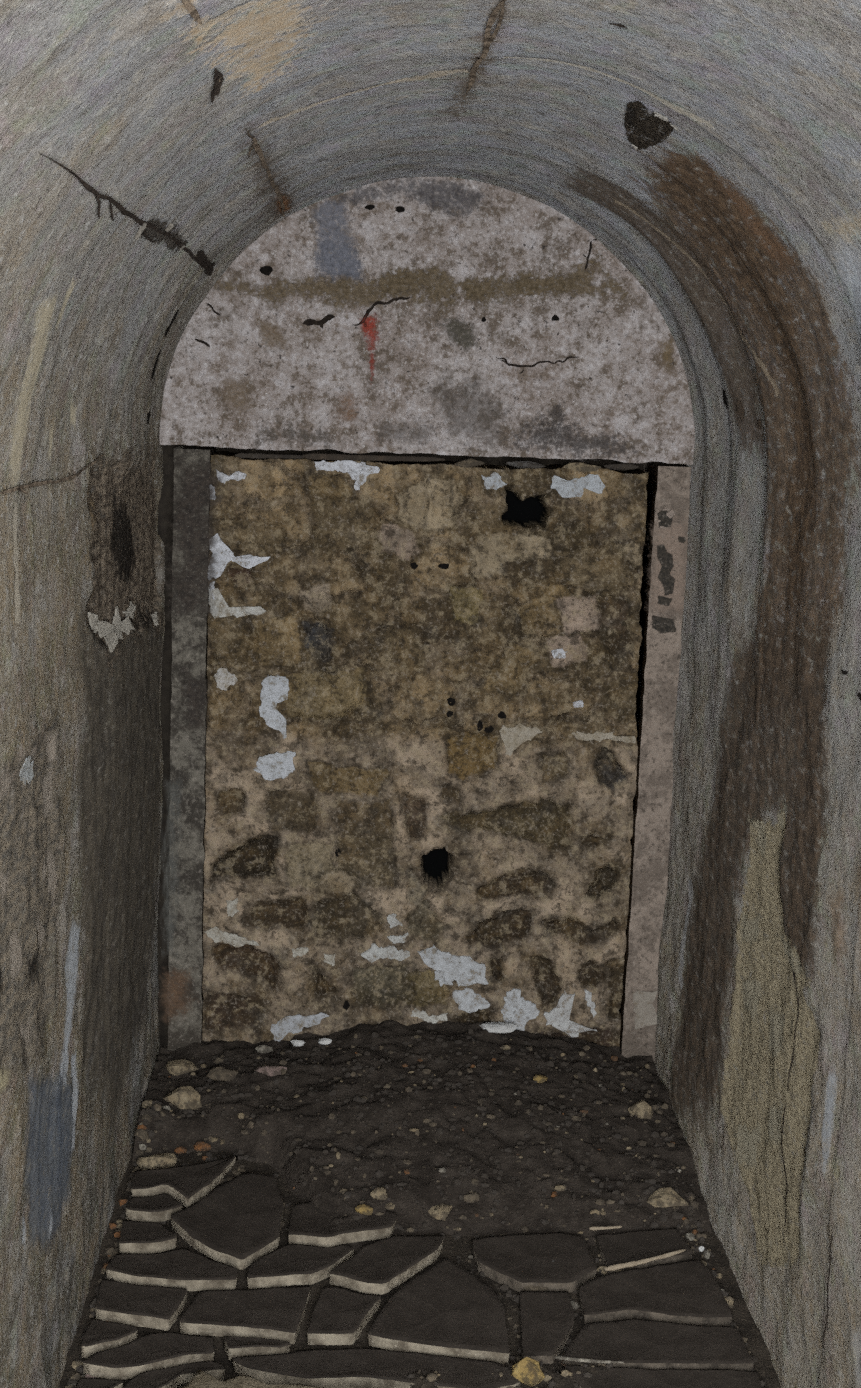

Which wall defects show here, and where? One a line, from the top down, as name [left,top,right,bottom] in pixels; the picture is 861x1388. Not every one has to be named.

crack [181,0,202,25]
crack [466,0,506,94]
spalling [624,101,678,150]
crack [40,153,220,347]
spalling [86,443,164,671]
peeling [292,947,336,966]
peeling [434,969,490,1013]